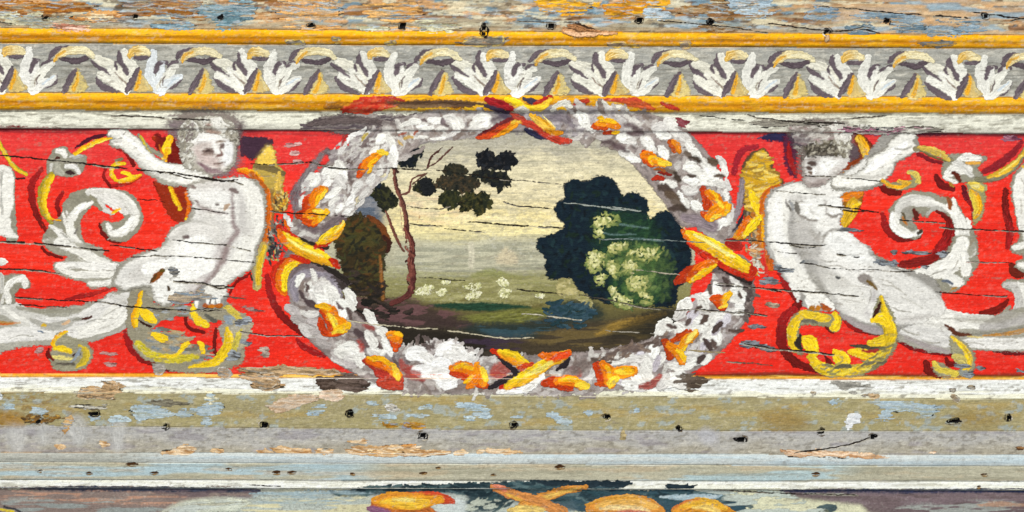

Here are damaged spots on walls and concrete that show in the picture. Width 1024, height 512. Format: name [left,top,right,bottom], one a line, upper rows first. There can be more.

peeling [532,0,776,33]
crack [0,155,641,233]
crack [772,175,1024,233]
peeling [235,306,263,327]
peeling [152,364,166,375]
peeling [216,341,348,416]
peeling [54,380,225,450]
peeling [160,444,197,456]
peeling [256,401,523,458]
peeling [546,411,573,426]
crack [795,437,870,453]
peeling [780,434,890,459]